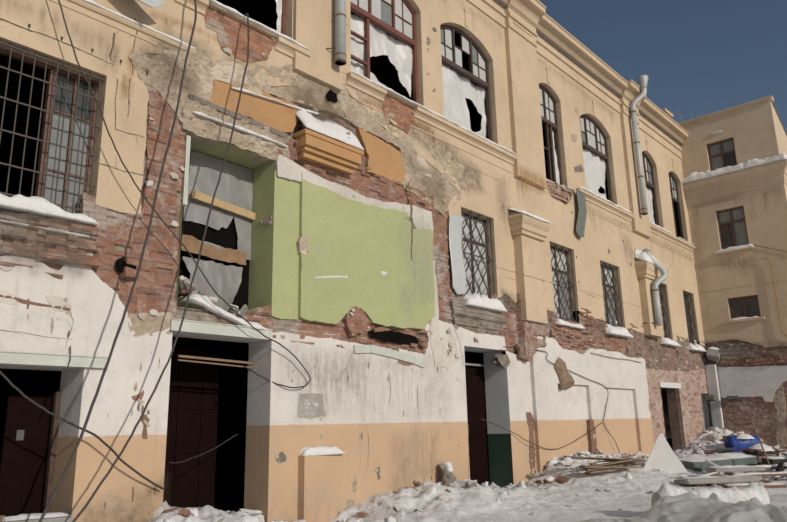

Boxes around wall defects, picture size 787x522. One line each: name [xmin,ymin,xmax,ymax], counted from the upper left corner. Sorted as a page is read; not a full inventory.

flaking render [204,7,276,63]
spalling [326,90,338,102]
flaking render [371,95,415,139]
flaking render [0,74,186,341]
flaking render [243,138,787,454]
spalling [131,382,150,439]